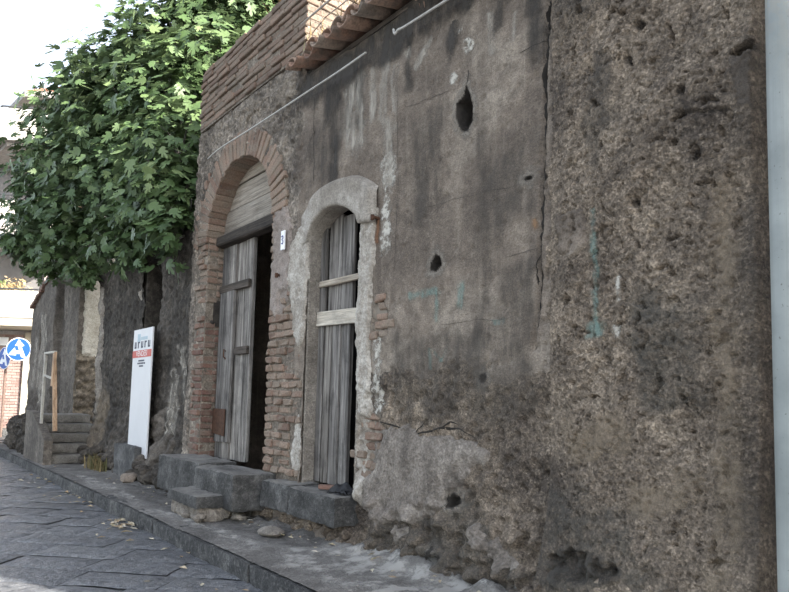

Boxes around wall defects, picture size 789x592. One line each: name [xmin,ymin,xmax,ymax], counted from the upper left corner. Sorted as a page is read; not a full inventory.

damp [488,0,503,29]
damp [527,0,547,53]
damp [297,0,474,185]
spalling [453,80,477,136]
crack [507,0,552,346]
peeling [350,195,395,506]
spalling [440,489,466,514]